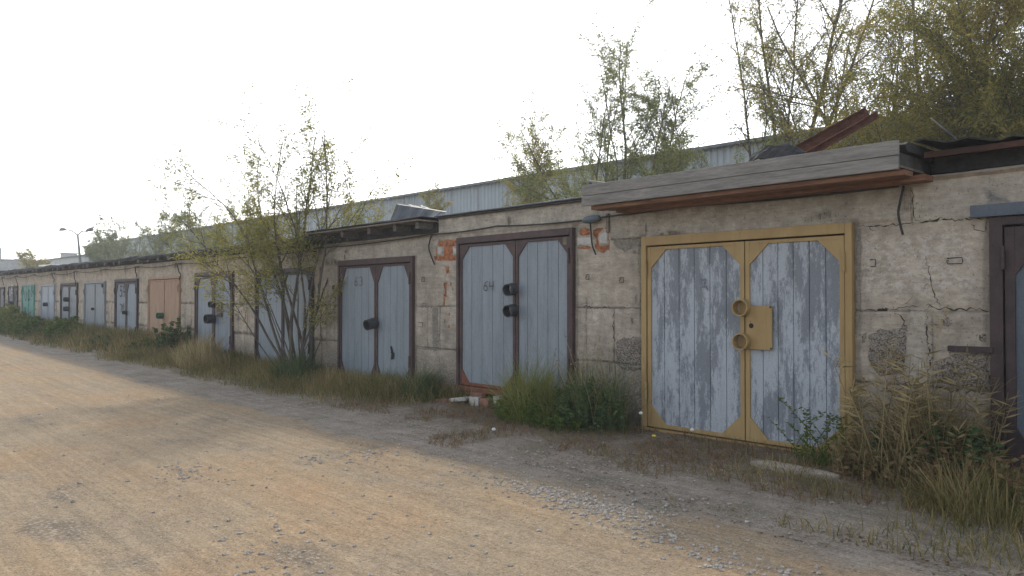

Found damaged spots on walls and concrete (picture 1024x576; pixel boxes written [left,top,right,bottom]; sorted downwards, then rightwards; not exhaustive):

crack [860,192,989,232]
flaking render [434,240,456,328]
flaking render [577,227,642,308]
spalling [854,228,907,376]
spalling [615,336,641,372]
spalling [934,334,990,390]